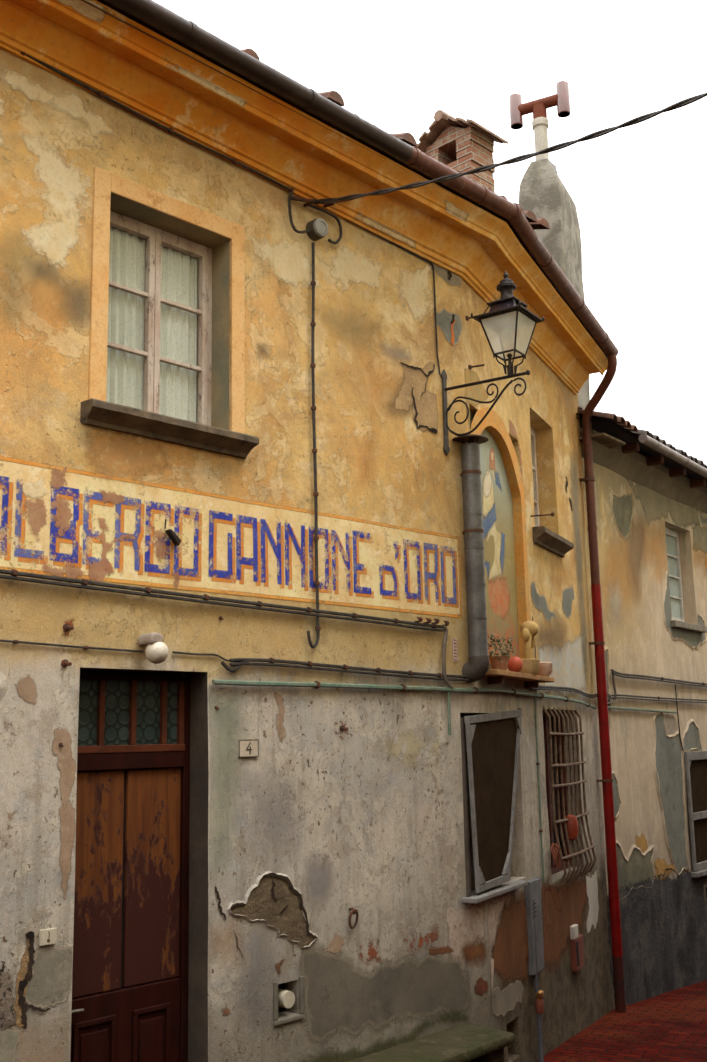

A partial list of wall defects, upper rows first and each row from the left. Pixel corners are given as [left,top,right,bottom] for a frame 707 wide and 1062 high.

flaking render [389,362,438,434]
peeling [23,468,72,540]
peeling [99,490,124,505]
peeling [42,517,135,582]
peeling [17,675,37,704]
peeling [52,728,76,899]
flaking render [227,871,345,954]
crack [0,931,51,1029]